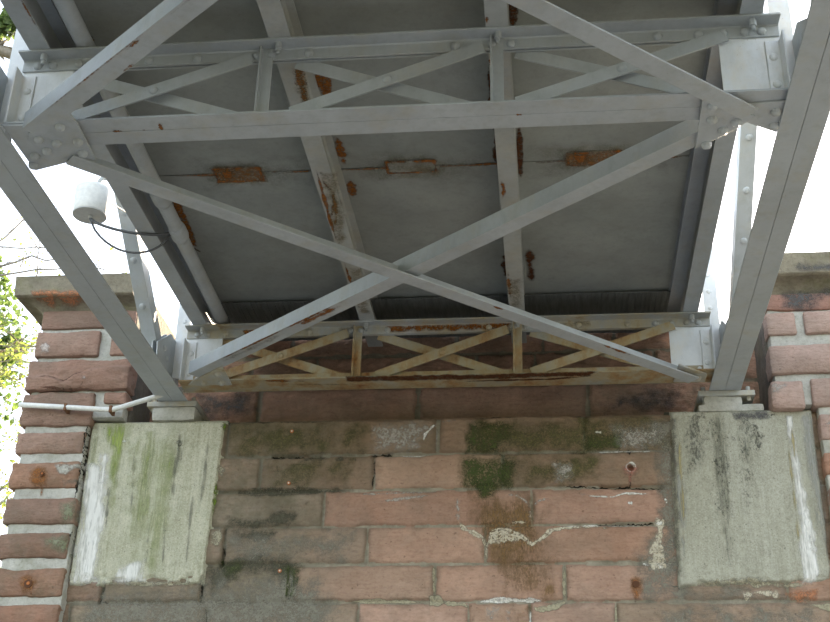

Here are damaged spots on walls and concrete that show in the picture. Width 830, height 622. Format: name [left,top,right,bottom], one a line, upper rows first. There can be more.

corrosion [509,4,518,26]
corrosion [295,69,332,102]
corrosion [187,167,266,183]
corrosion [335,138,497,174]
corrosion [543,150,622,166]
corrosion [293,170,344,240]
corrosion [525,251,535,280]
corrosion [346,371,595,382]
leakage [734,412,773,456]
leakage [787,414,825,582]
leakage [74,454,109,583]
leakage [457,458,607,618]